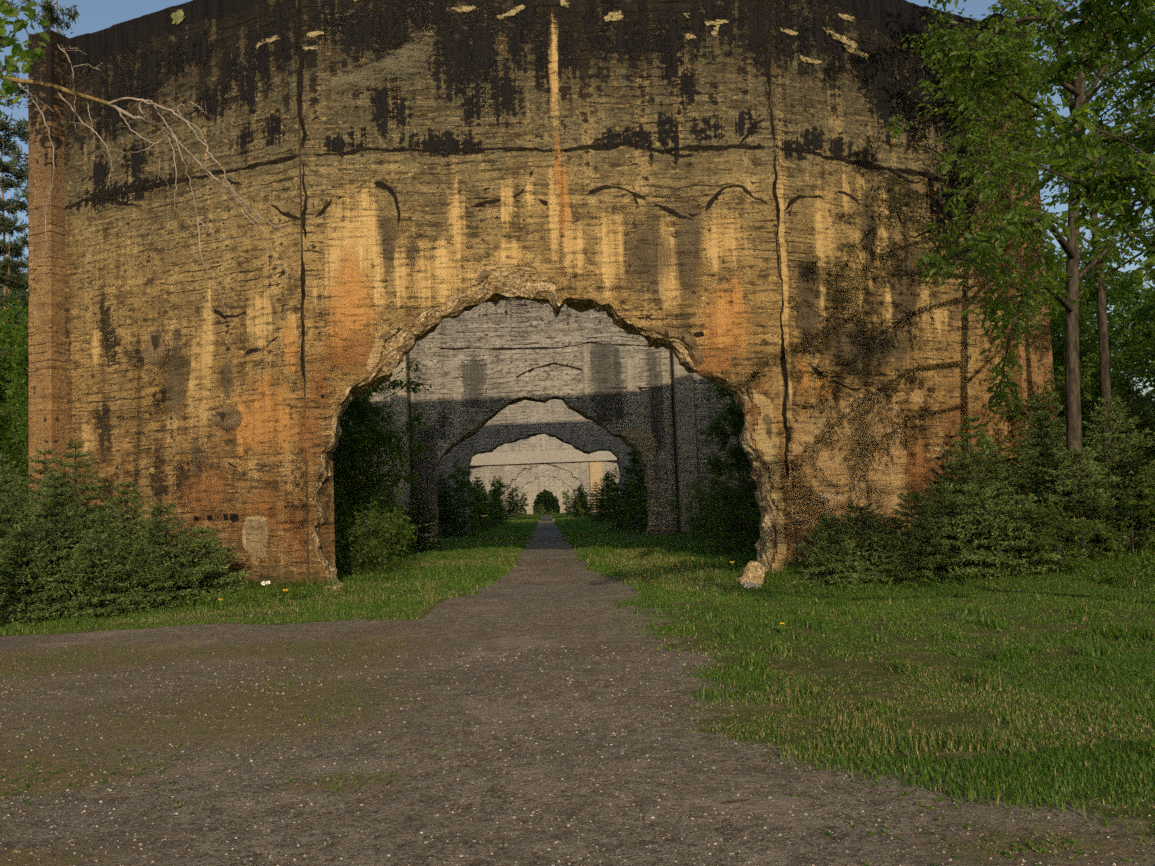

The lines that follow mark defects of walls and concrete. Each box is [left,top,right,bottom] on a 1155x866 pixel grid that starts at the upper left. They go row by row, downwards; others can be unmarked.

peeling [604,12,623,22]
peeling [706,19,728,37]
peeling [823,27,869,58]
damp [64,0,292,212]
corrosion [555,139,571,237]
damp [313,0,989,417]
crack [65,0,970,514]
damp [91,290,120,370]
damp [246,293,272,348]
damp [286,312,297,346]
damp [82,400,112,459]